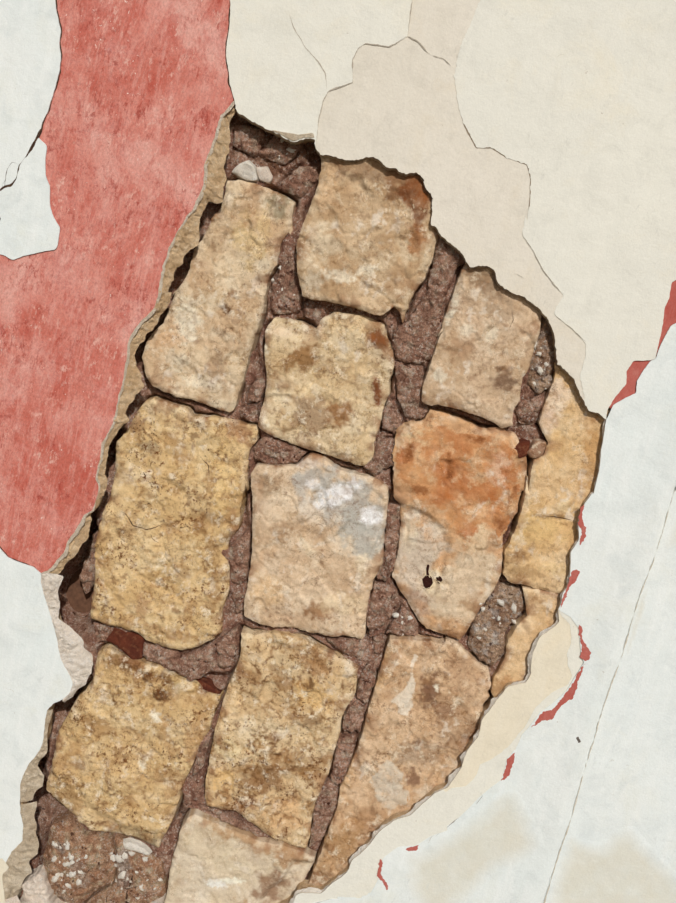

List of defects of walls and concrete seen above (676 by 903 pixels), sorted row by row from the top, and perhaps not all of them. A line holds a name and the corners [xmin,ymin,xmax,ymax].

crack [0,0,62,191]
crack [291,3,451,142]
crack [462,119,531,207]
peeling [0,0,433,702]
peeling [609,280,676,408]
spalling [289,223,606,903]
spalling [2,709,53,903]
peeling [123,838,152,855]
leakage [398,740,545,903]
leakage [543,826,676,903]